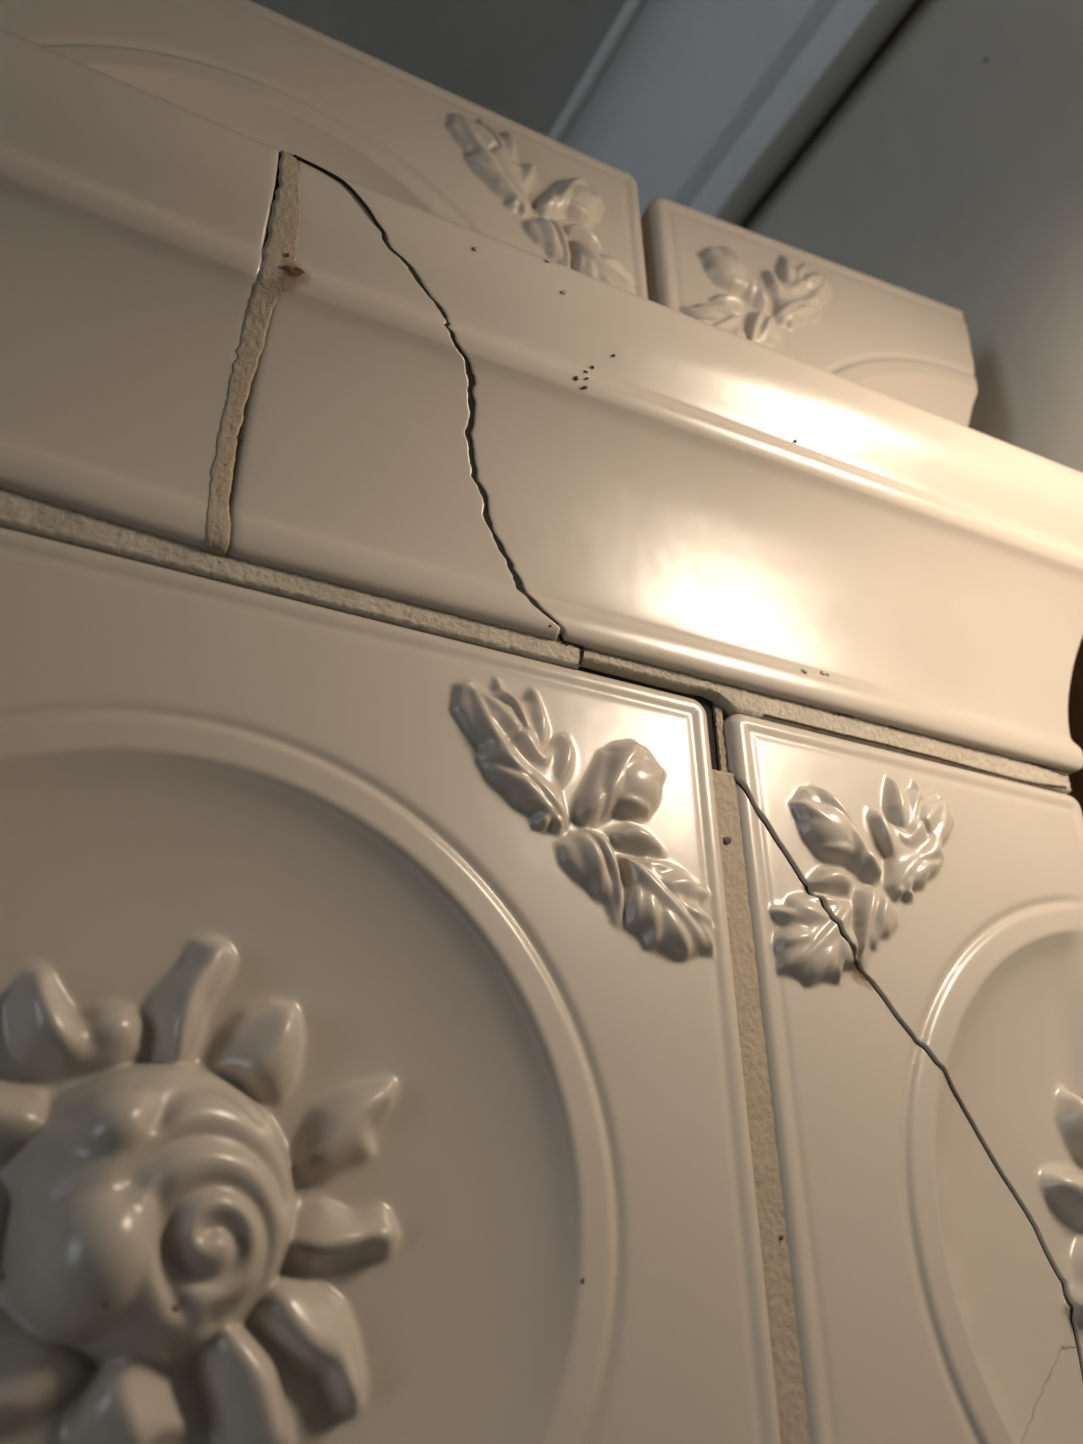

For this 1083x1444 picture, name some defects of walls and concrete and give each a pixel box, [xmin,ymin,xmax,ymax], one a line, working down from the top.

crack [293,154,585,665]
crack [736,781,1083,1444]